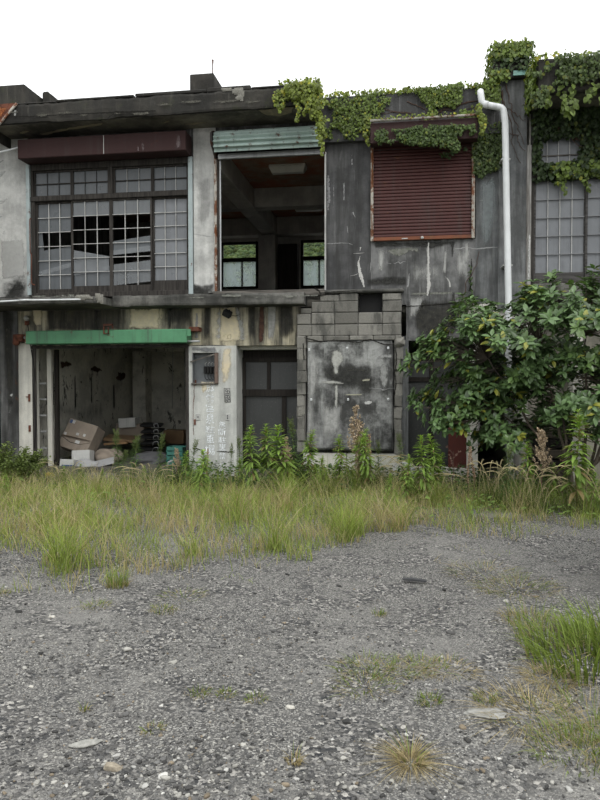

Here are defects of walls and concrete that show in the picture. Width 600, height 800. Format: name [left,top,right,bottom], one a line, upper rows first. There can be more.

leakage [407,178,497,334]
leakage [195,307,255,340]
leakage [268,307,276,338]
leakage [378,355,391,391]
leakage [307,351,362,437]